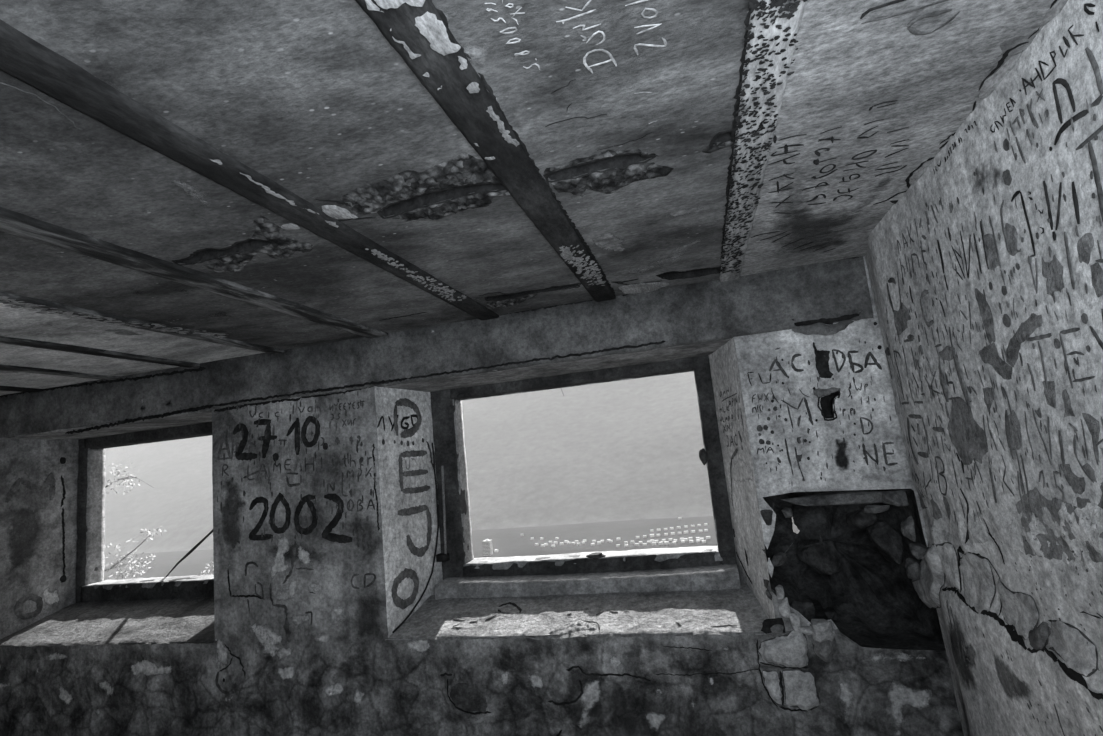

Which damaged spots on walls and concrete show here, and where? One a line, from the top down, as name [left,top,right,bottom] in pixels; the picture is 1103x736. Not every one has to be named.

peeling [365,0,484,70]
peeling [466,82,480,93]
peeling [487,106,519,146]
spalling [240,143,510,228]
spalling [543,149,674,197]
spalling [171,215,314,272]
peeling [365,248,466,302]
spalling [484,233,721,309]
spalling [757,381,1103,661]
crack [942,532,1103,700]
flaking render [889,682,930,735]
spalling [994,651,1068,736]